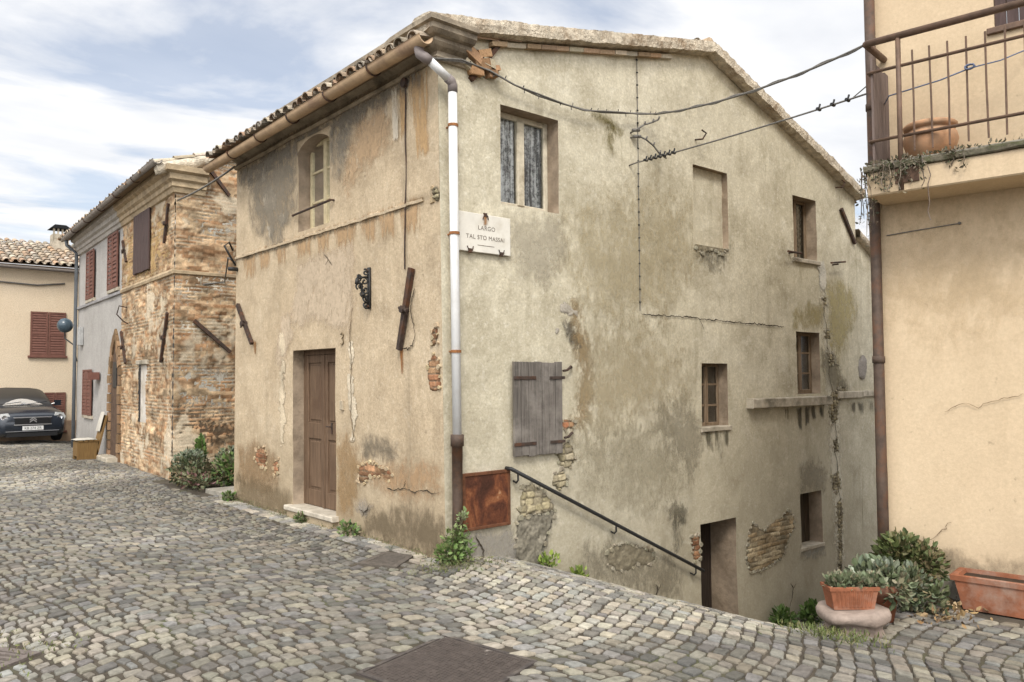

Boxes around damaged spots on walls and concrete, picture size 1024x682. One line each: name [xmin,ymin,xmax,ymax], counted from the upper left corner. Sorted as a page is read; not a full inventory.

crack [643,314,784,327]
flaking render [426,322,442,391]
water stain [785,406,823,428]
peeling [239,441,280,488]
flaking render [355,459,395,486]
flaking render [513,418,578,564]
flaking render [689,532,703,564]
flaking render [745,508,796,574]